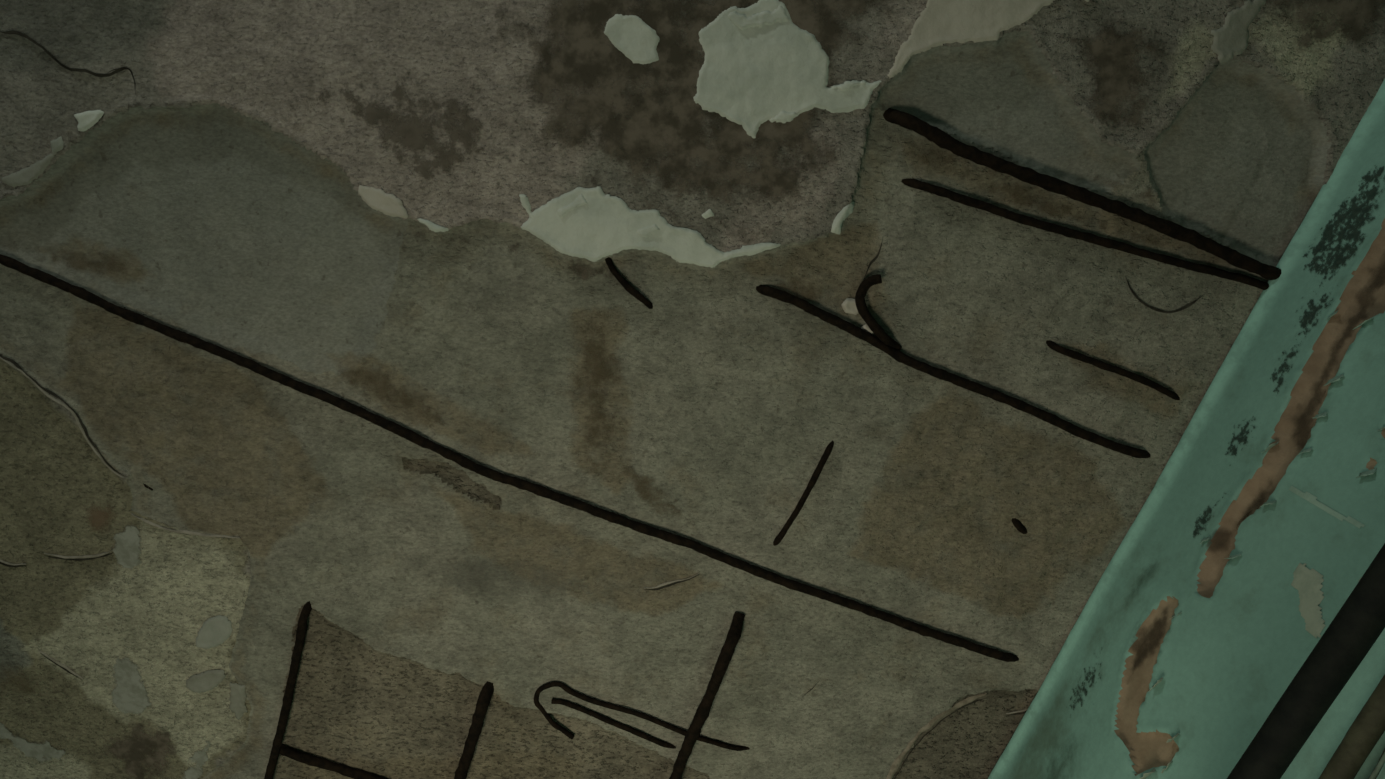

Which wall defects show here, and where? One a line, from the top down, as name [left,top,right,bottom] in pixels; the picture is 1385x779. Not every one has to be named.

water stain [318,72,484,190]
water stain [497,0,835,219]
water stain [779,0,890,86]
peeling [830,80,867,91]
rust [883,108,1281,290]
spalling [871,31,1332,267]
rust [0,254,1019,662]
flaking render [0,103,1268,779]
rust [756,274,1150,458]
peeling [1196,218,1385,598]
rust [264,601,386,779]
rust [669,611,745,779]